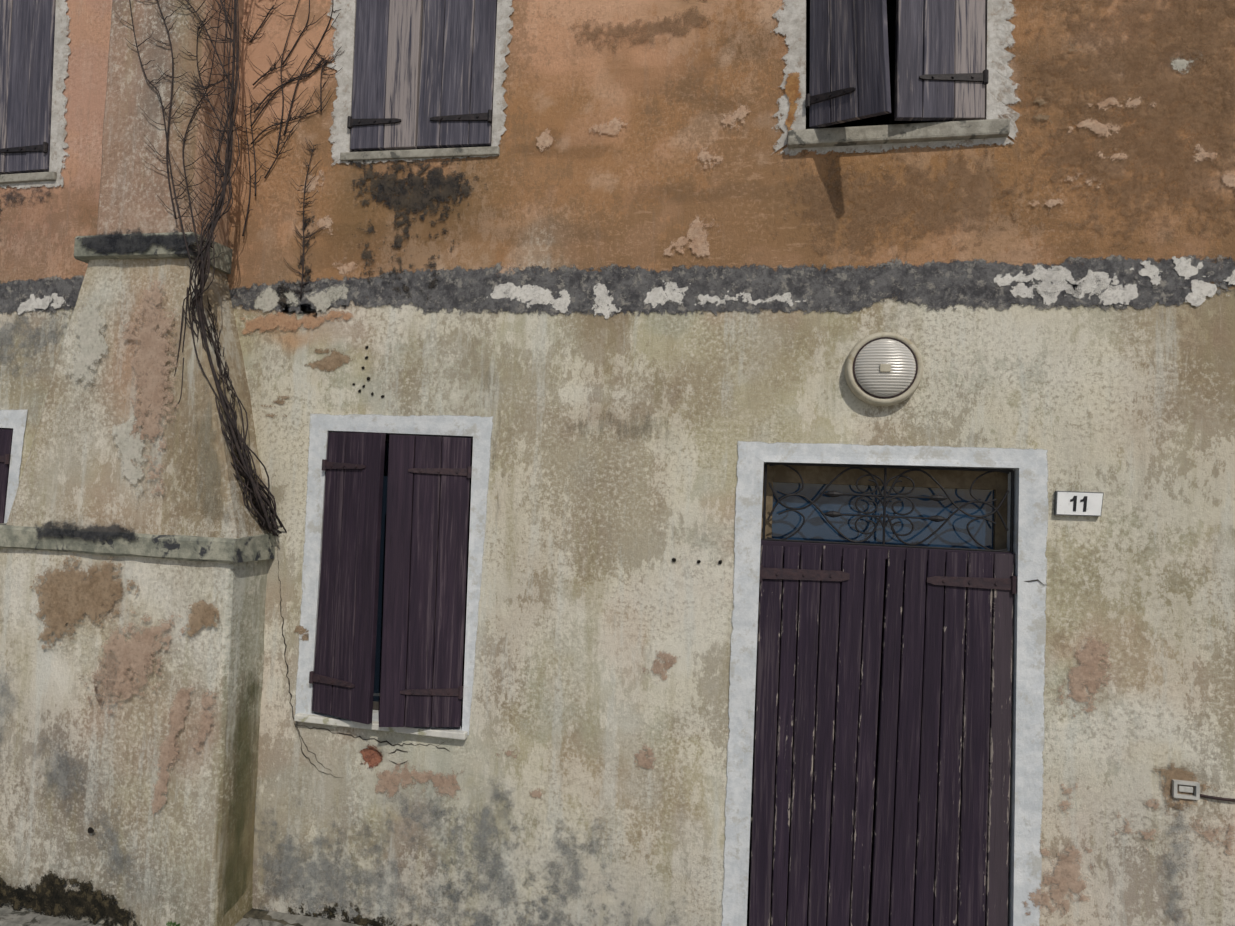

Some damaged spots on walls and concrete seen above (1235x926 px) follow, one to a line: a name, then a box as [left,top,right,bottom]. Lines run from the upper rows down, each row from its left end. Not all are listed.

water stain [346,146,486,307]
peeling [240,257,357,335]
peeling [486,263,571,313]
peeling [592,283,622,319]
peeling [643,281,811,308]
peeling [994,256,1235,307]
spalling [305,346,385,398]
peeling [30,555,219,715]
water stain [224,682,257,913]
water stain [263,821,498,926]
water stain [451,792,516,903]
water stain [521,836,599,926]